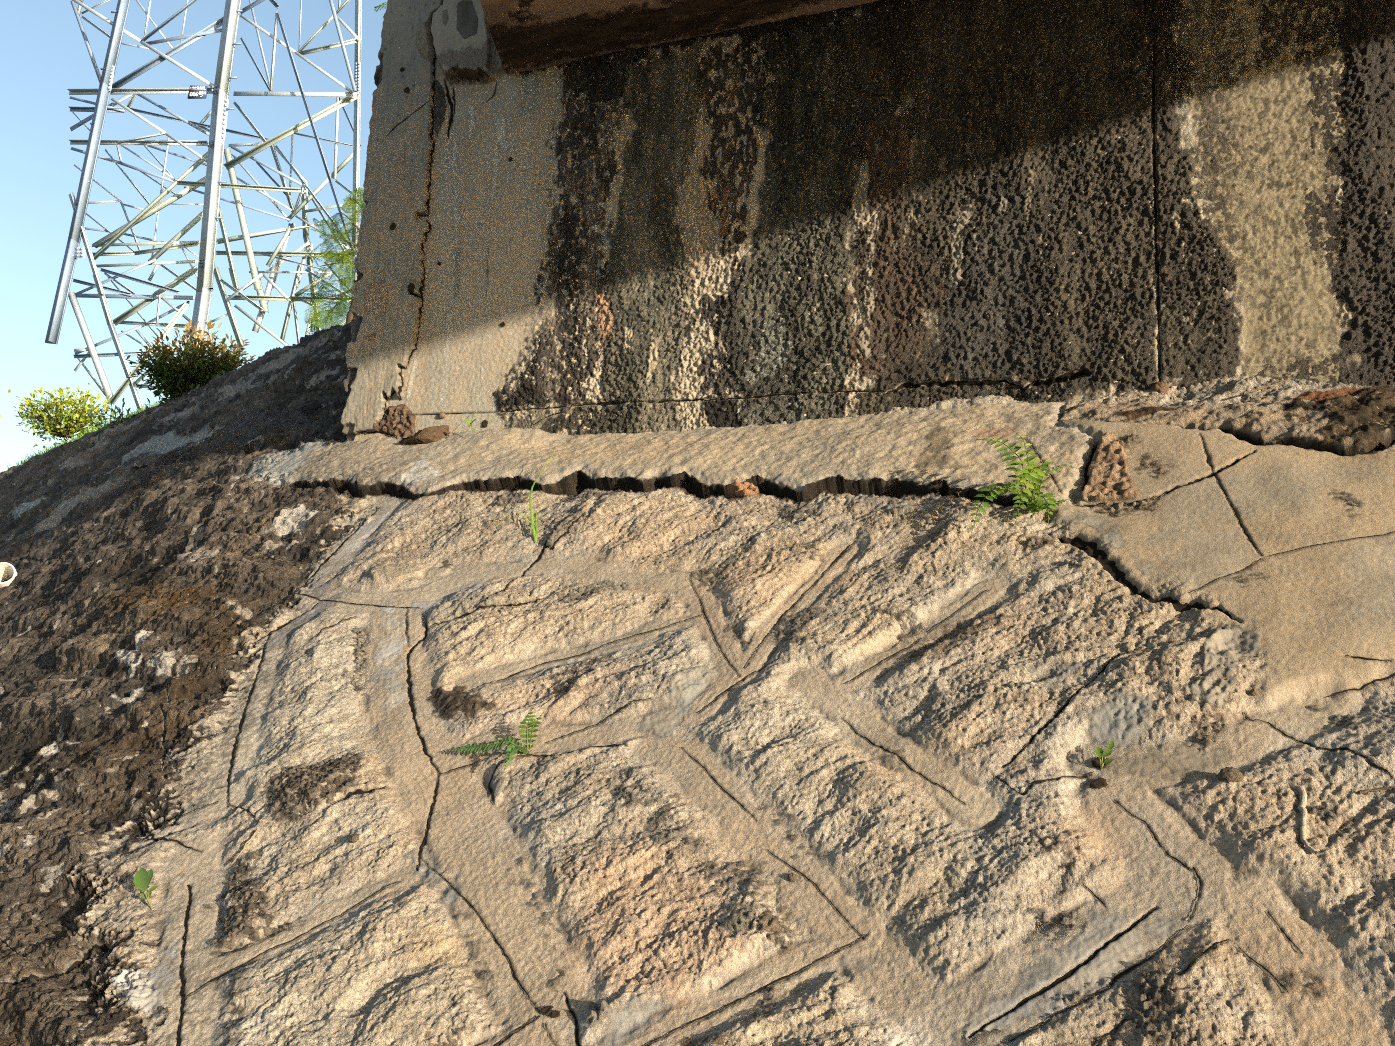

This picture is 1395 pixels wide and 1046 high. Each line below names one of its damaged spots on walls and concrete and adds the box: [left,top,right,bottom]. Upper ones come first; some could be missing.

crack [387,81,497,139]
spalling [452,64,486,81]
water stain [439,0,924,436]
water stain [931,169,1051,380]
water stain [1144,0,1395,397]
water stain [1118,406,1176,422]
crack [421,372,1395,794]
crack [122,473,1027,1046]
crack [1092,1015,1129,1046]
crack [969,799,1289,1041]